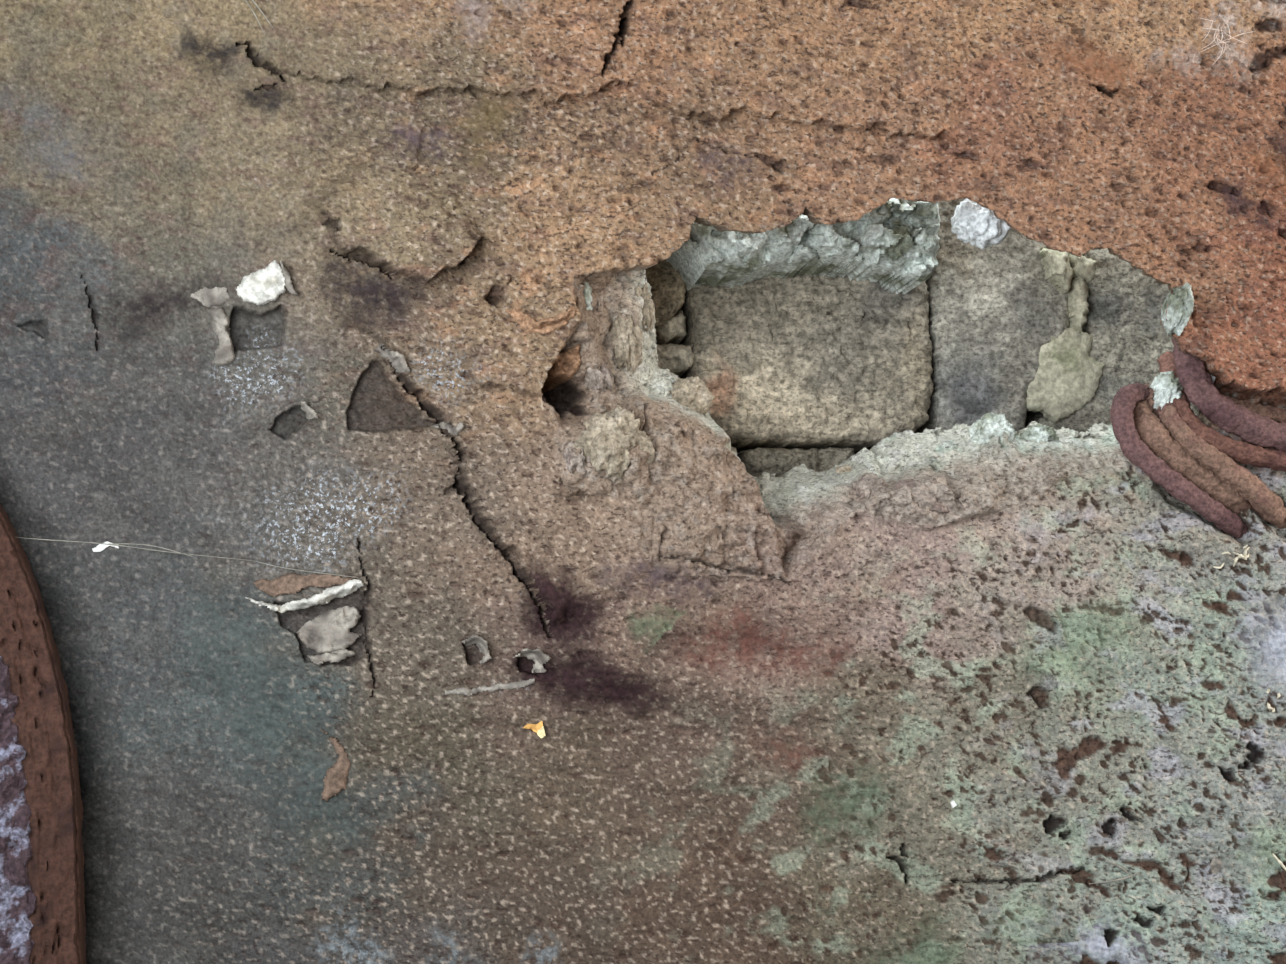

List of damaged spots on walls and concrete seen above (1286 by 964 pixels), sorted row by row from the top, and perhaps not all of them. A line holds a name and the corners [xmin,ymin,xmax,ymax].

crack [236,42,286,90]
crack [601,0,635,75]
spalling [666,198,1012,294]
flaking render [190,260,299,367]
spalling [346,343,465,436]
spalling [542,267,1135,581]
rust [1110,338,1286,538]
crack [383,343,553,637]
flaking render [245,573,367,666]
water stain [1263,628,1286,677]
crack [951,868,1083,886]
water stain [1089,936,1115,954]